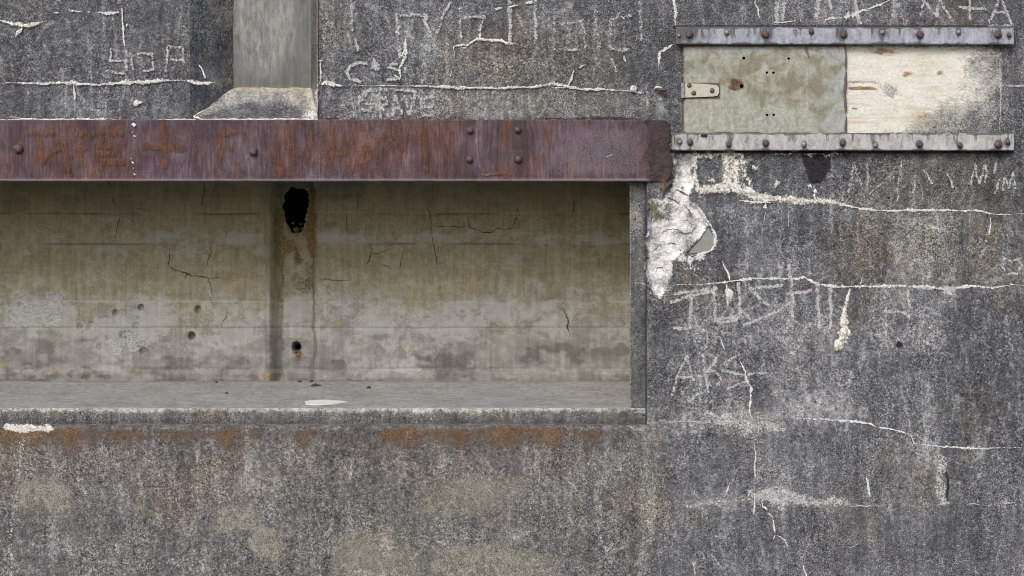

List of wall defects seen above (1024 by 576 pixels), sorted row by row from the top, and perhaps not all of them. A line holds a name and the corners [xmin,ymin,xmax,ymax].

water stain [690,151,838,205]
spalling [282,187,309,238]
crack [426,198,518,262]
spalling [644,154,718,301]
crack [739,195,1024,252]
crack [168,248,218,293]
crack [677,261,1024,290]
corrosion [0,426,141,452]
corrosion [381,425,598,450]
crack [796,418,1020,450]